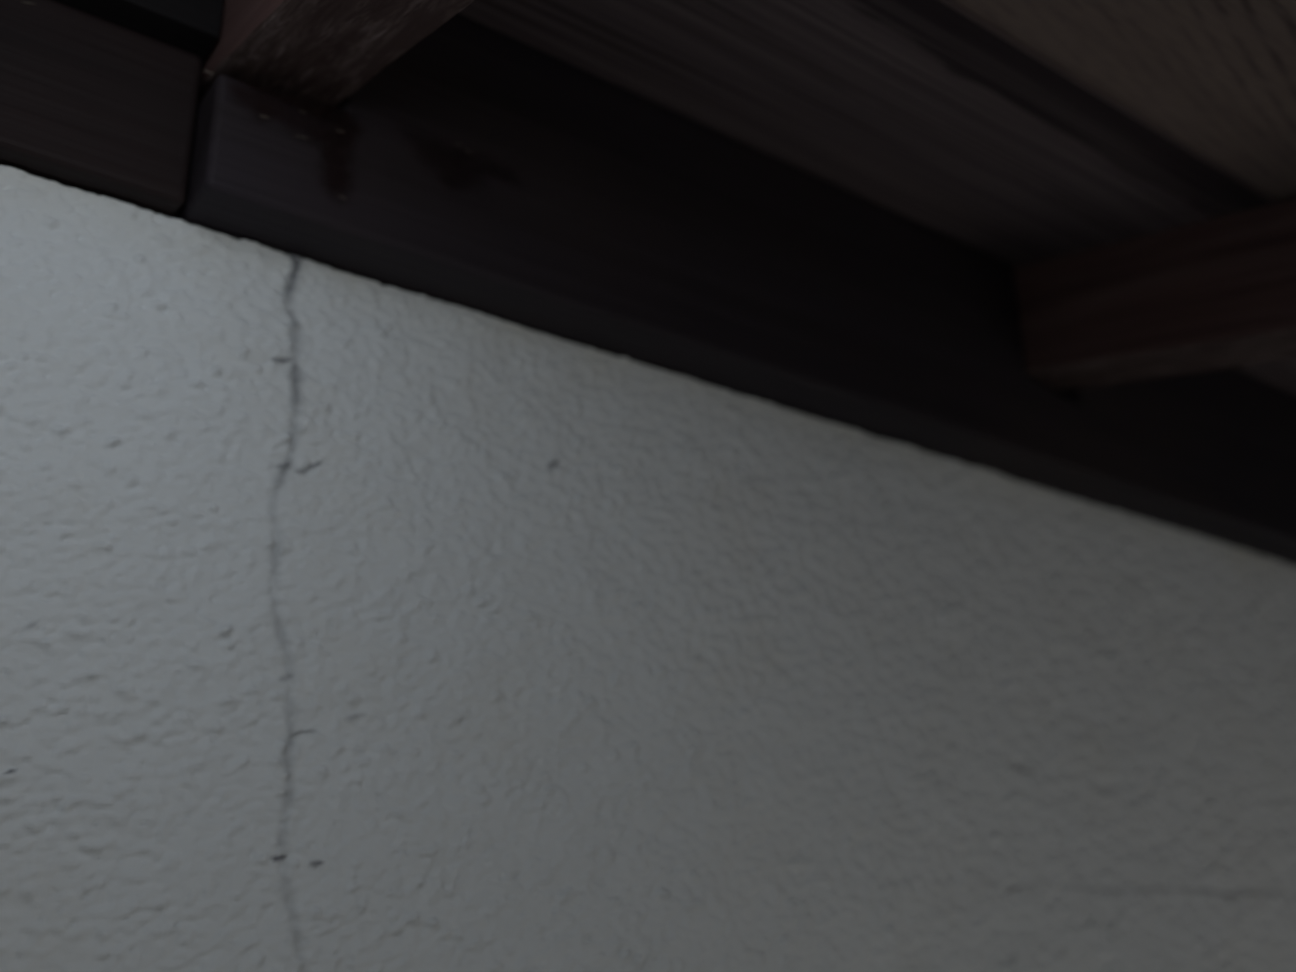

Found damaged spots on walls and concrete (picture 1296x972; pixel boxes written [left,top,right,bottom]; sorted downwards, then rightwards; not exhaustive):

crack [287,254,301,293]